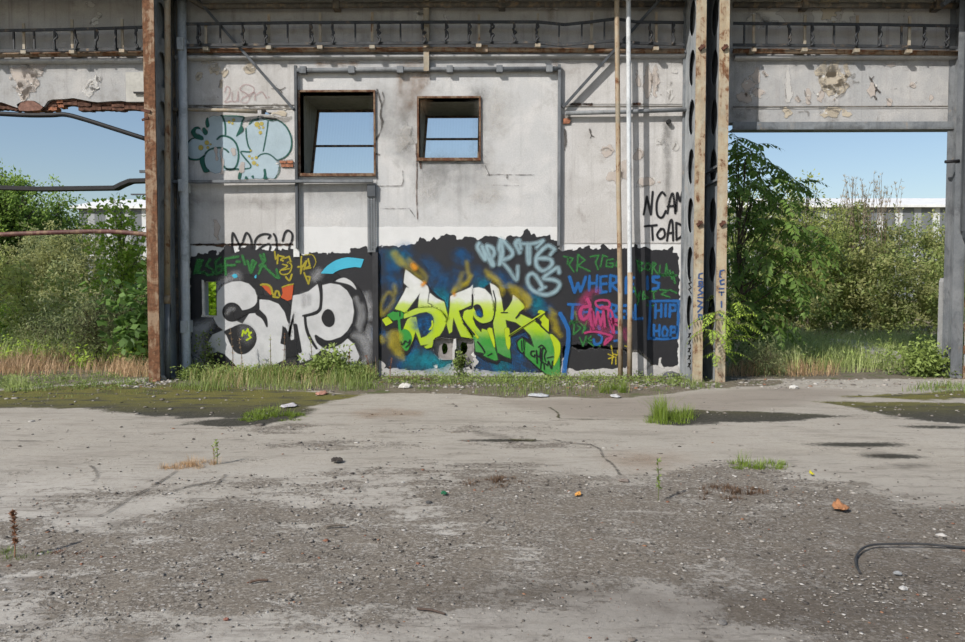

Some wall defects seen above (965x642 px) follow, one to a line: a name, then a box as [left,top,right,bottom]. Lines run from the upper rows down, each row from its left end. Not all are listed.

spalling [0,57,144,113]
peeling [782,61,852,118]